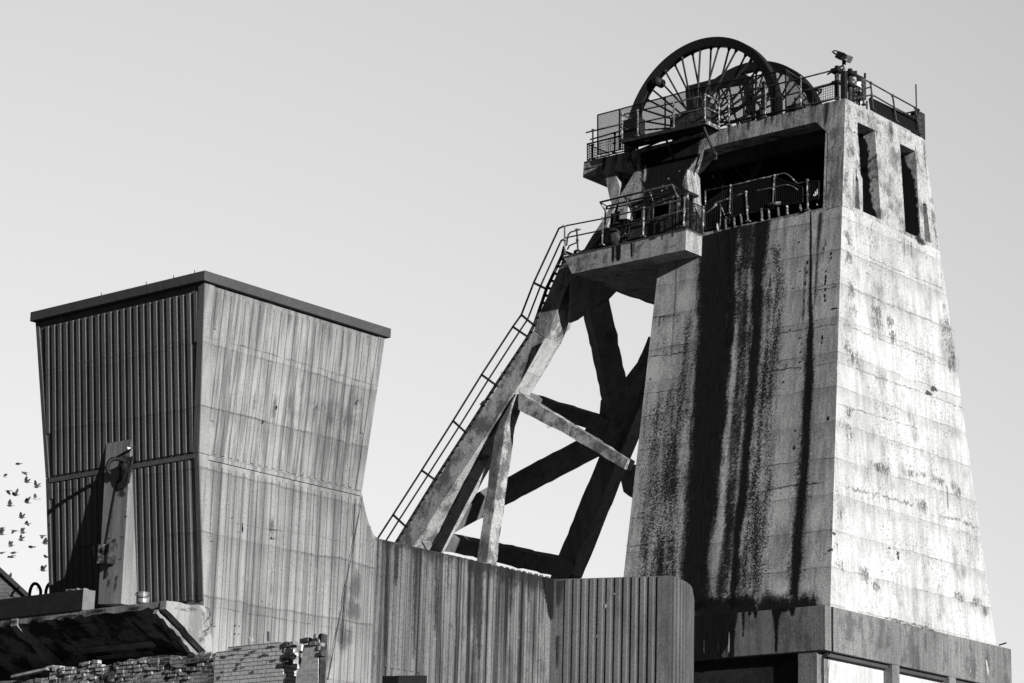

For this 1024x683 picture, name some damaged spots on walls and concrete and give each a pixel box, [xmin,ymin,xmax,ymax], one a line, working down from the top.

leakage [872,301,896,342]
leakage [940,304,959,371]
leakage [627,212,822,660]